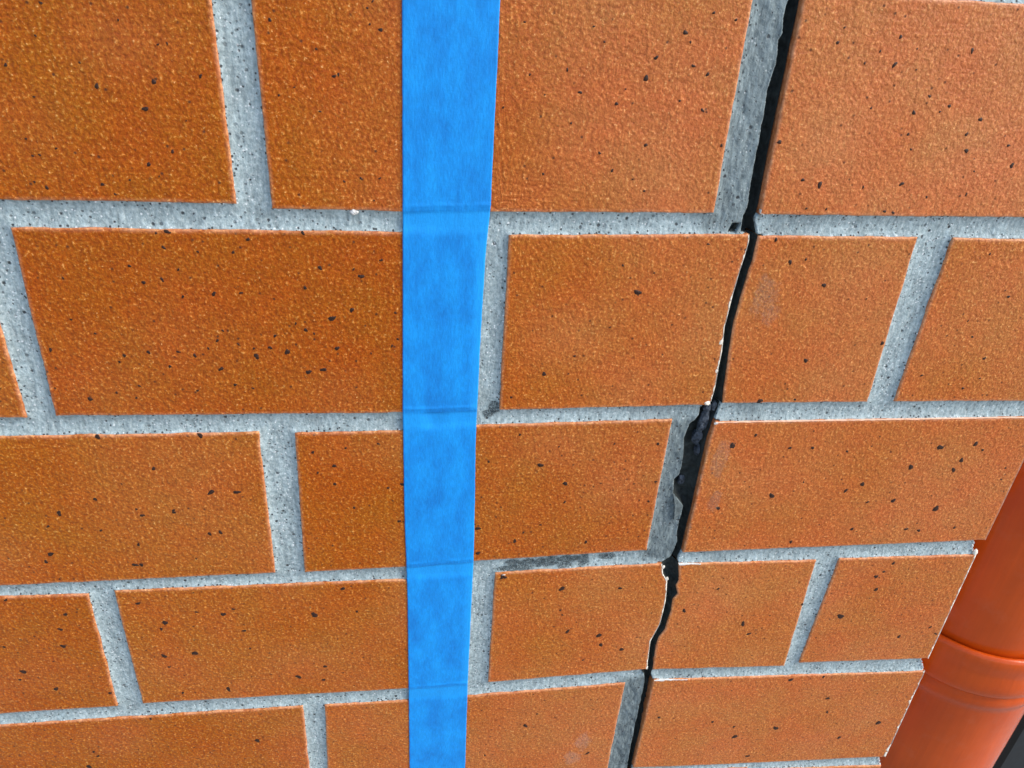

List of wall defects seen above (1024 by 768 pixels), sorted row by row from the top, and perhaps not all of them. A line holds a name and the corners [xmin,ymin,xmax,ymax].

crack [627,0,799,768]